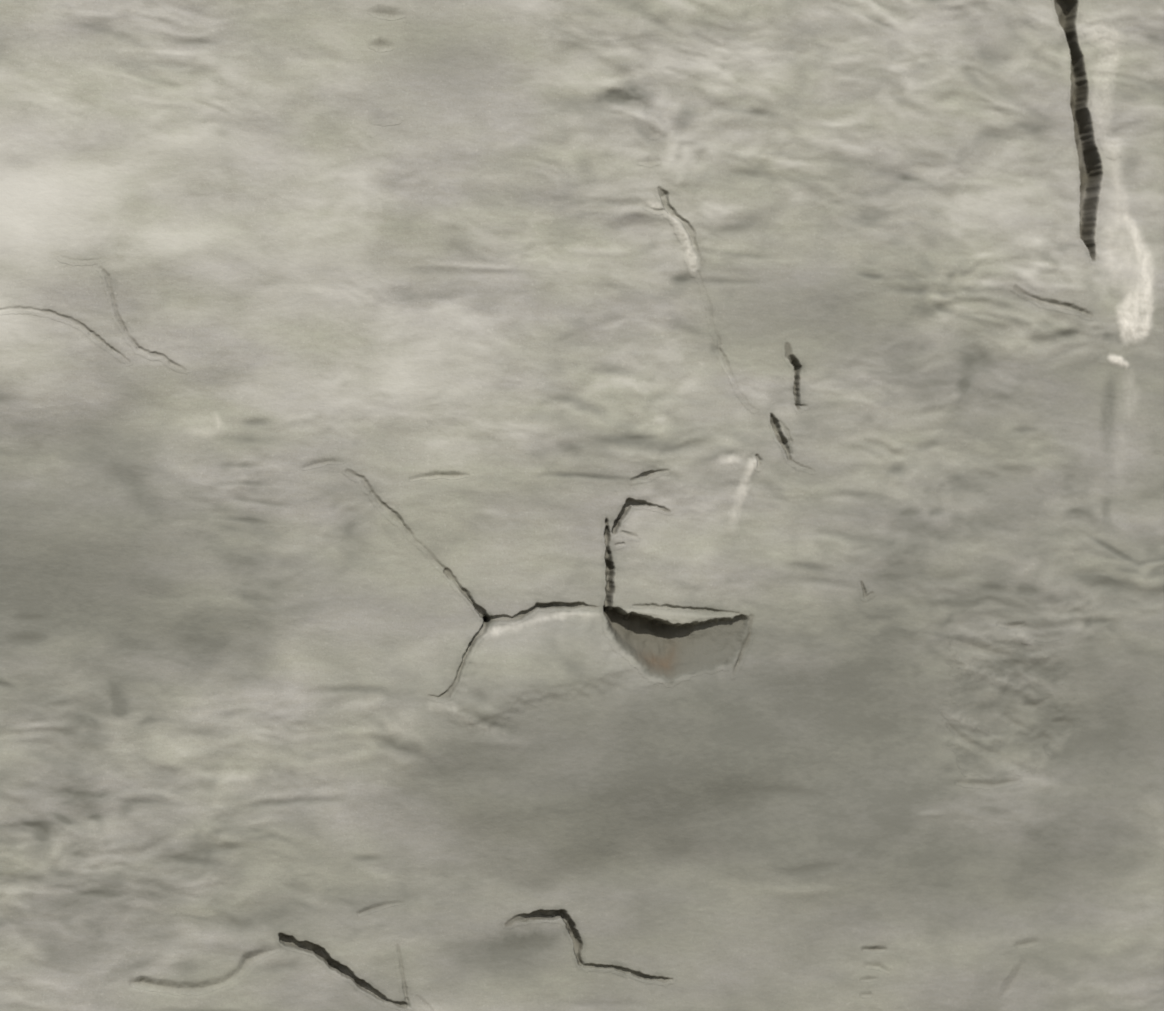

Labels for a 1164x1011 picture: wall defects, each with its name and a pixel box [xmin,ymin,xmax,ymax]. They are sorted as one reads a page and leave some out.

crack [1052,0,1127,265]
crack [0,252,190,374]
crack [642,183,818,474]
crack [301,458,673,703]
flaking render [427,600,756,737]
crack [129,929,438,1011]
crack [357,901,405,917]
crack [502,905,677,987]